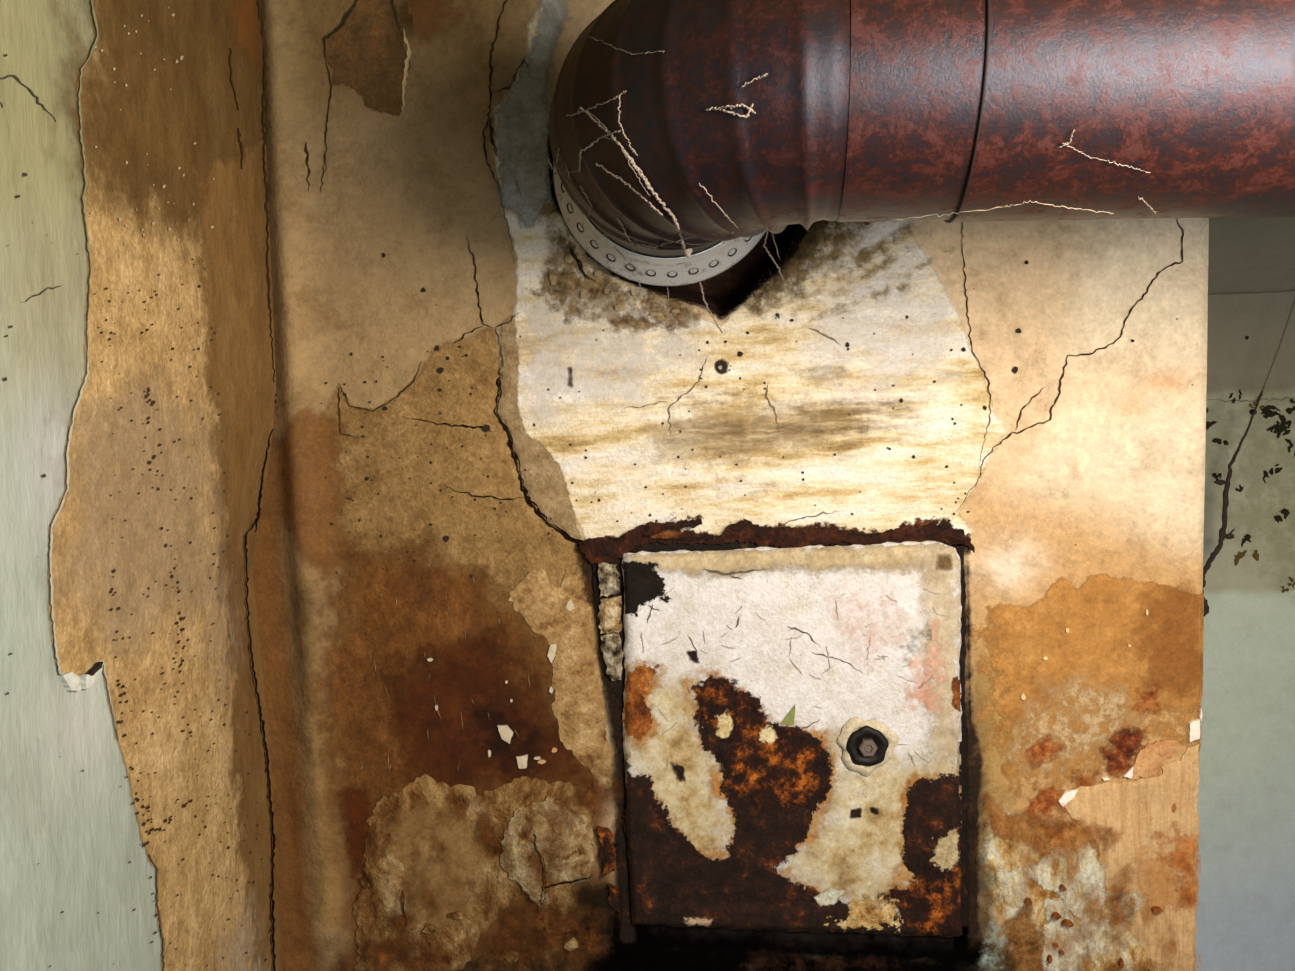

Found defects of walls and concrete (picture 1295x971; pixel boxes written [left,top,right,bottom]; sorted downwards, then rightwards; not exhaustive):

peeling [323,0,412,170]
peeling [48,0,283,971]
crack [229,0,276,971]
leakage [261,328,588,643]
flaking render [352,566,613,971]
crack [404,239,582,544]
corrosion [314,515,984,971]
peeling [494,0,1009,540]
crack [957,218,1184,511]
leakage [971,574,1204,796]
mould [1235,534,1259,566]
mould [1229,389,1295,483]